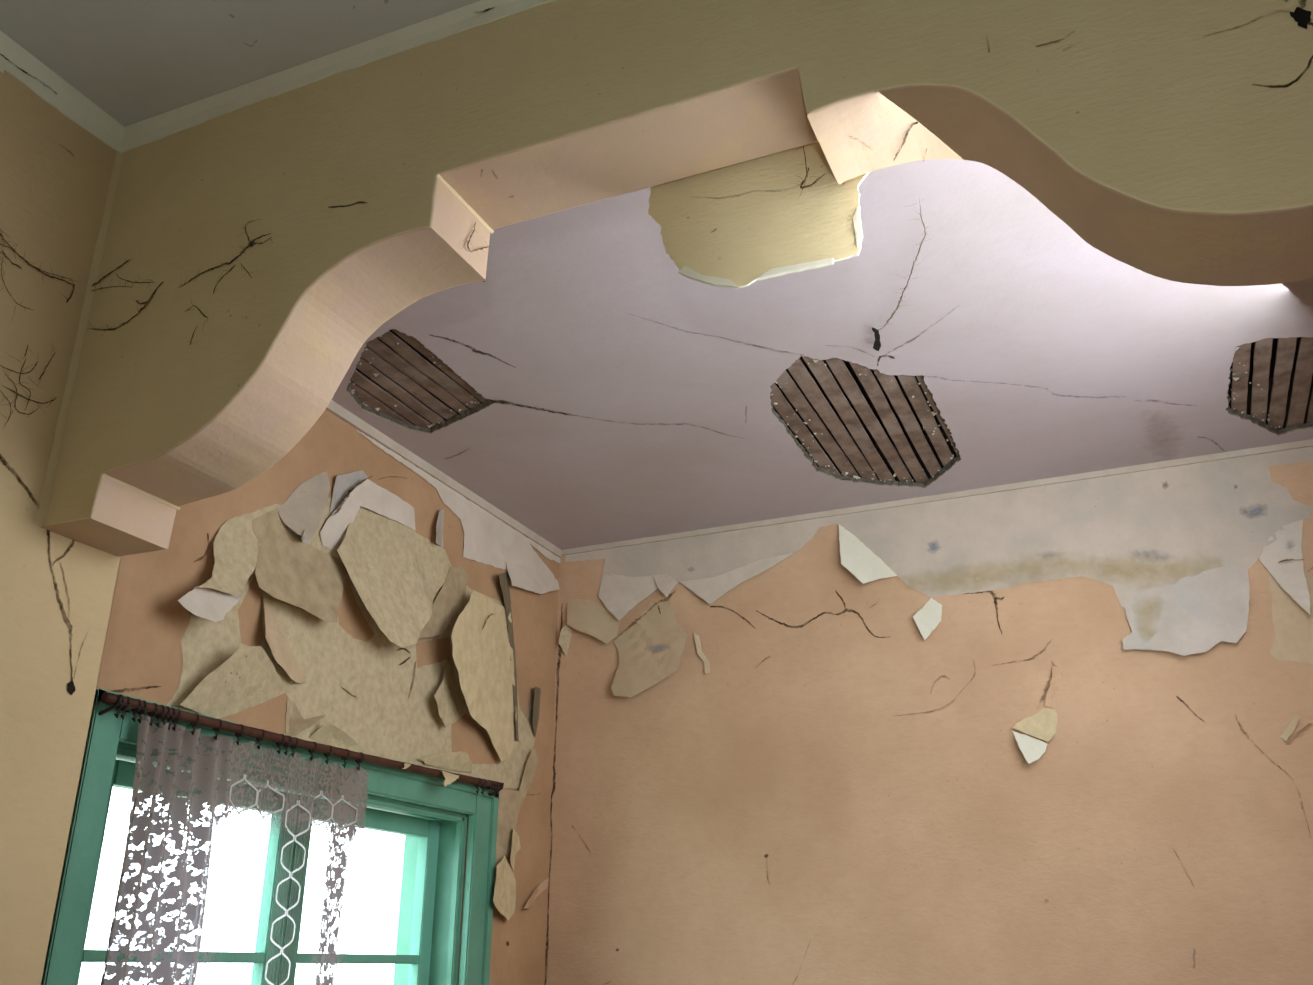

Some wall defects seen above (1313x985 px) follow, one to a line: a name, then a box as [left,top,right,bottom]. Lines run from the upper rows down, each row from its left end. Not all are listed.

crack [1258,0,1313,88]
peeling [648,142,869,289]
crack [87,219,273,337]
spalling [346,329,494,432]
crack [431,335,516,368]
crack [491,400,577,416]
spalling [1226,337,1313,435]
crack [0,454,83,695]
crack [620,593,673,635]
peeling [167,356,1313,921]
crack [710,590,885,638]
crack [964,591,1041,663]